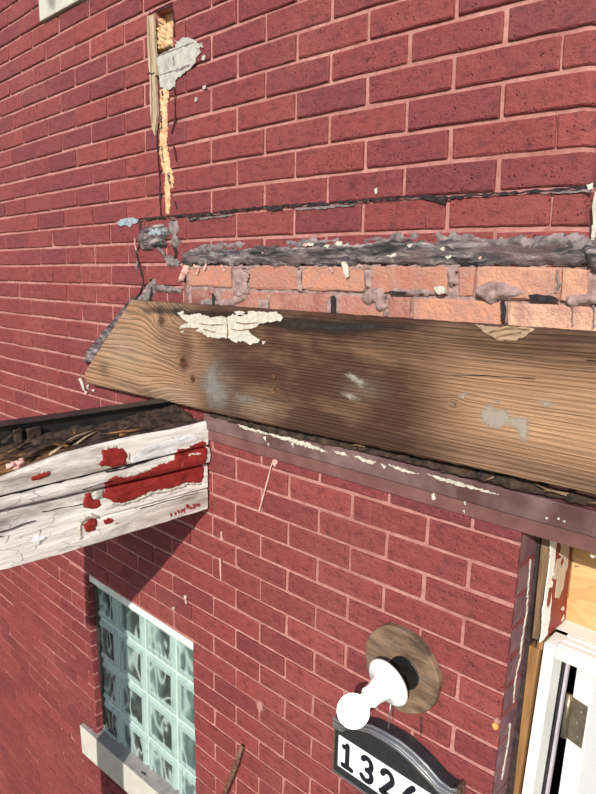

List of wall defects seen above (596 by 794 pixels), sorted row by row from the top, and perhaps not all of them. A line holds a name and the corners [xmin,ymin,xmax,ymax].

spalling [157,37,206,90]
crack [134,4,593,299]
spalling [178,191,596,345]
peeling [31,470,51,481]
peeling [78,434,208,540]
peeling [238,424,499,495]
peeling [539,541,574,642]